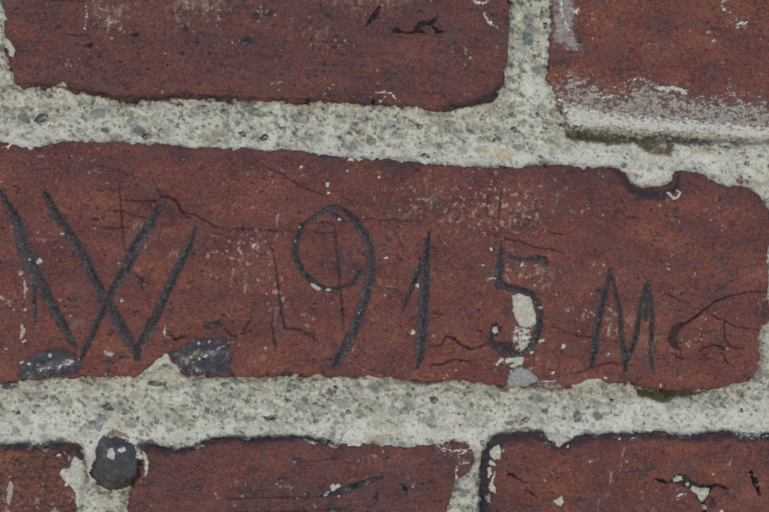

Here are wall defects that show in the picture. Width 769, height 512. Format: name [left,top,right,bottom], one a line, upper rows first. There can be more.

damp [547,72,769,157]
crack [664,291,762,364]
spalling [654,474,727,512]